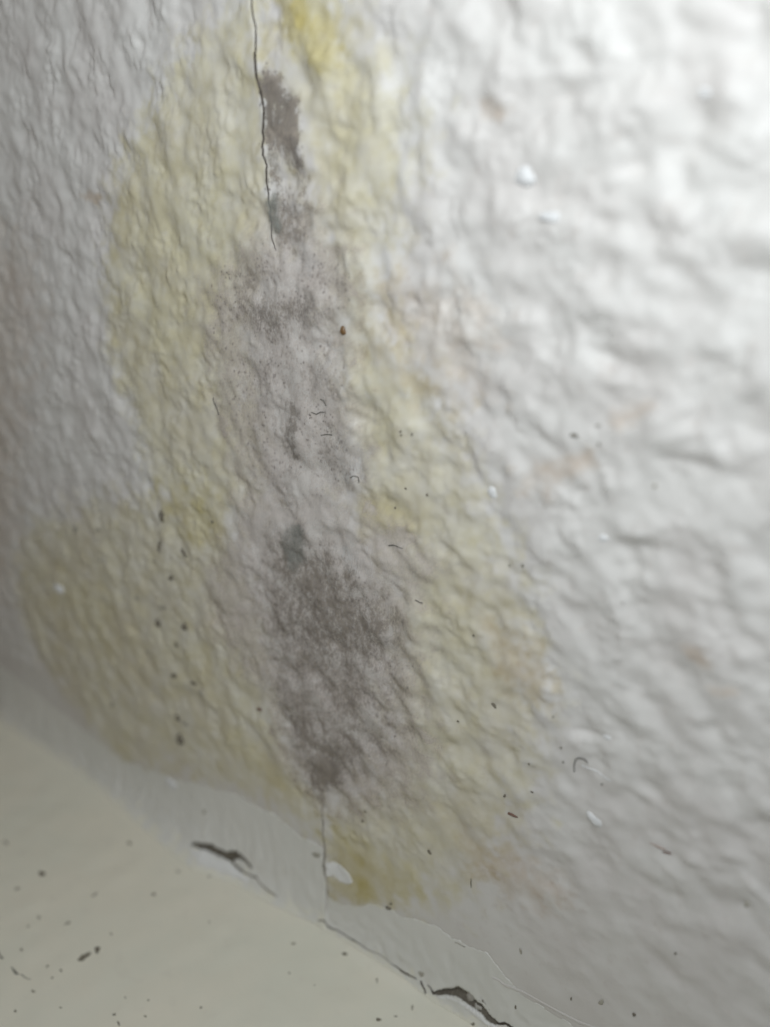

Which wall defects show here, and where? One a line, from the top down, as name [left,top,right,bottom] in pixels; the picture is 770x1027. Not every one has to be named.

crack [251,0,276,250]
leakage [210,62,433,814]
crack [317,796,435,995]